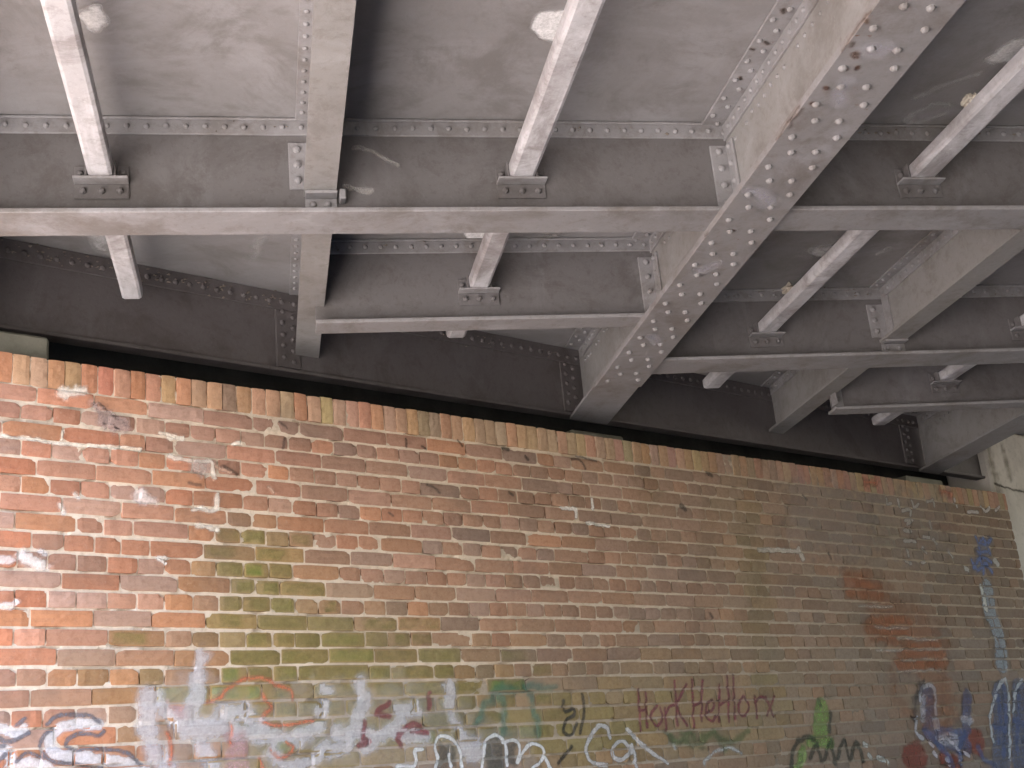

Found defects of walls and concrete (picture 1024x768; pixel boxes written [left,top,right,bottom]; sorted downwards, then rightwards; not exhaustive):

damp [58,386,87,398]
damp [134,490,155,504]